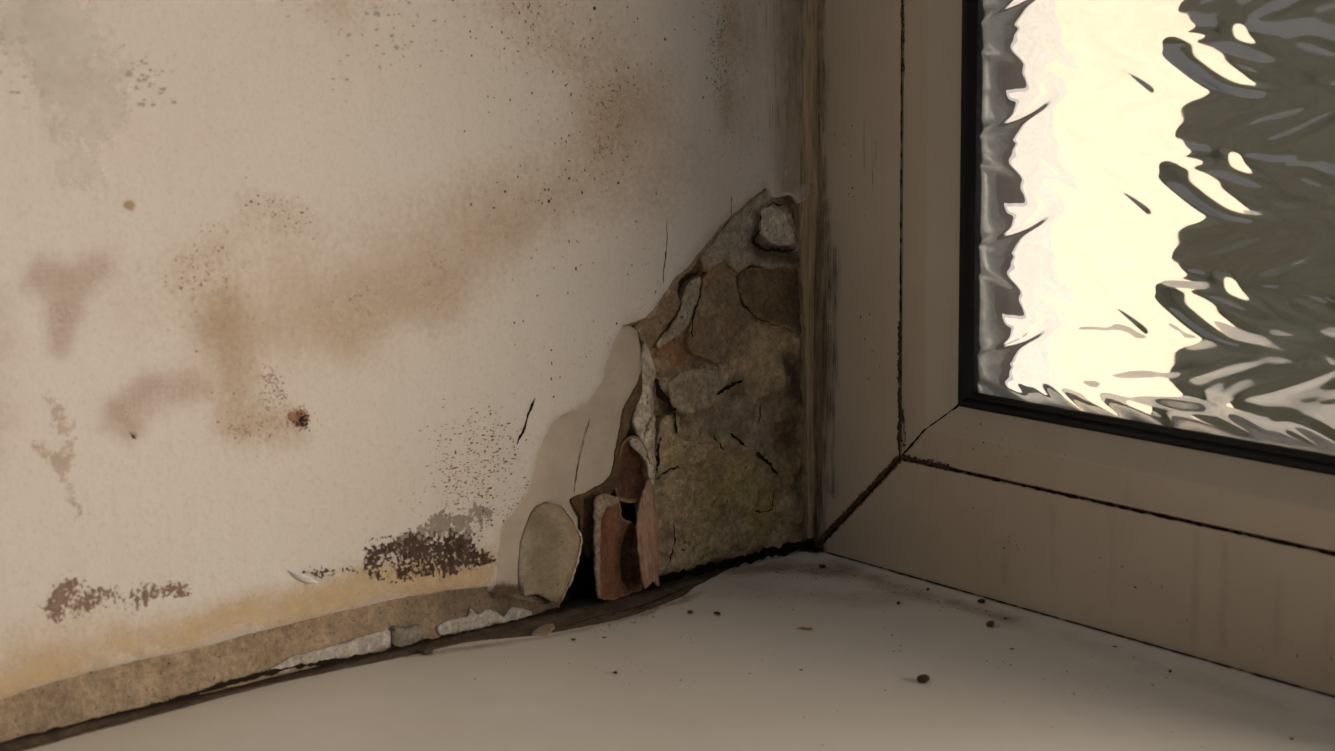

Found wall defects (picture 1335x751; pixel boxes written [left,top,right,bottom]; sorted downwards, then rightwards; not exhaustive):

leakage [118,56,177,112]
leakage [324,0,446,70]
leakage [463,1,671,213]
leakage [162,195,322,457]
spalling [0,189,815,742]
leakage [42,571,192,626]